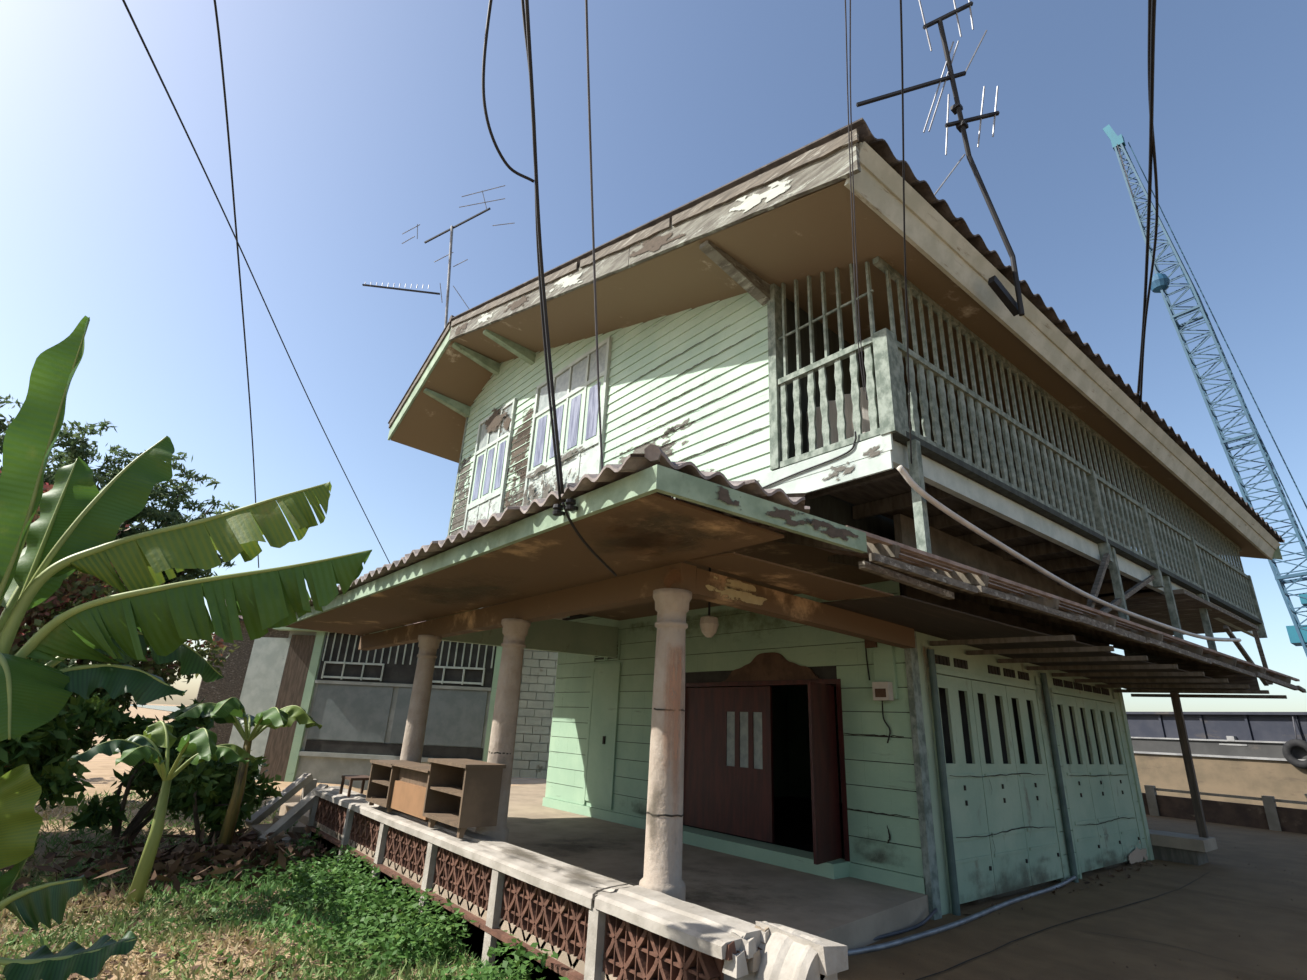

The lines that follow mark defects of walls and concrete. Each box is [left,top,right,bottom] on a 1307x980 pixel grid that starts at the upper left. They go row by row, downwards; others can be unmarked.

peeling [729,180,791,217]
peeling [549,272,582,292]
peeling [455,296,529,335]
peeling [619,418,694,463]
peeling [451,405,583,535]
peeling [701,469,741,510]
peeling [765,507,858,541]